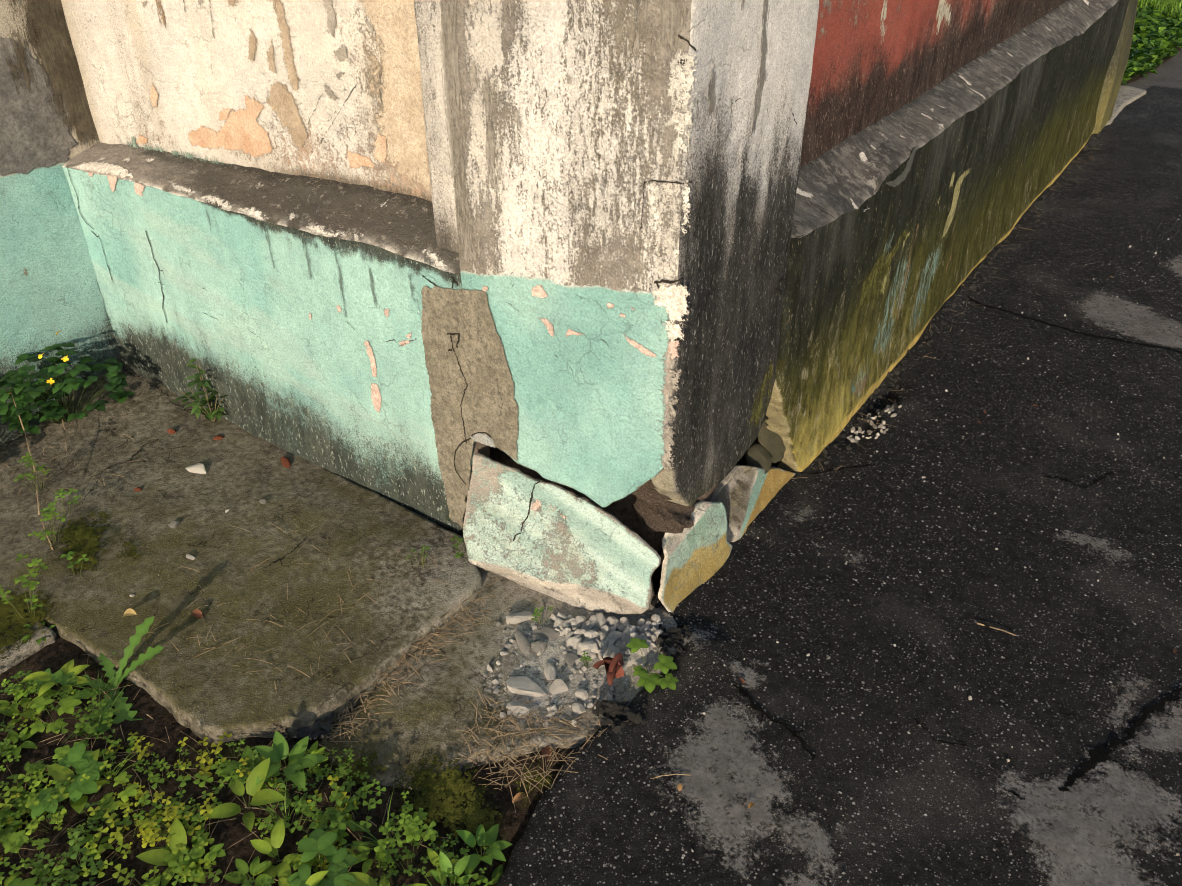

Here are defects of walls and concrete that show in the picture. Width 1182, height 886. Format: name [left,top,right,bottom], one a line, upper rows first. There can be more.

peeling [322,0,348,103]
peeling [936,0,952,34]
peeling [72,0,309,196]
peeling [346,0,432,197]
spalling [168,181,270,221]
spalling [289,213,364,240]
spalling [422,249,450,273]
damp [859,225,912,312]
damp [935,168,971,238]
damp [1071,252,1182,349]
crack [447,333,503,485]
crack [513,480,540,541]